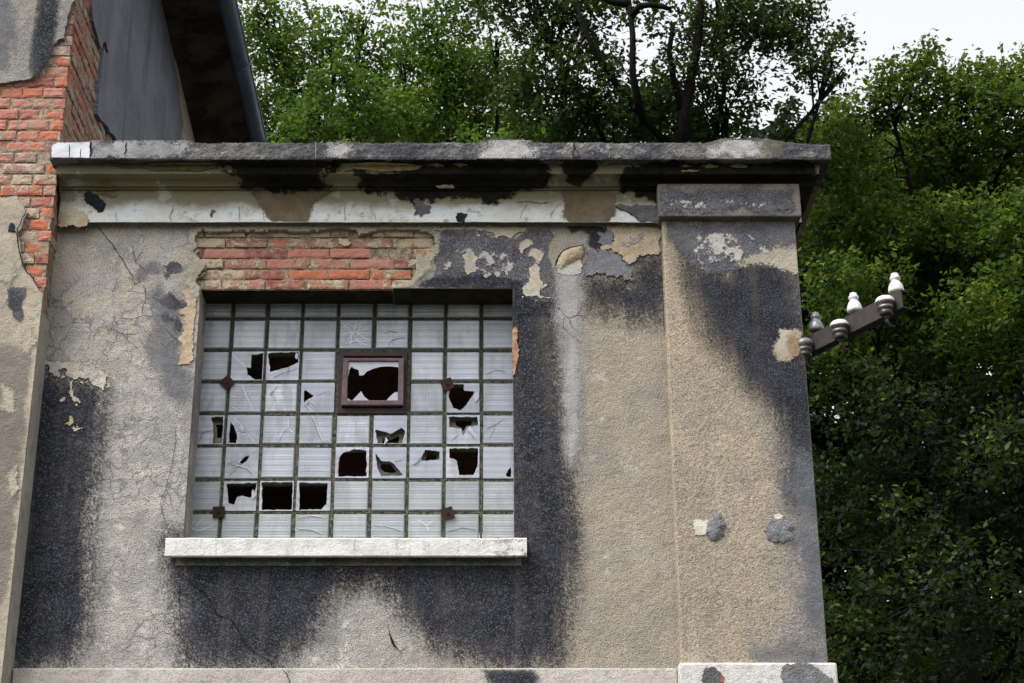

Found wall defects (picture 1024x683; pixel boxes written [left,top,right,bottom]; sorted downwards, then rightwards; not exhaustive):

spalling [0,0,117,311]
crack [98,211,178,348]
spalling [171,198,551,365]
peeling [583,203,661,285]
peeling [694,232,798,274]
spalling [512,327,520,375]
peeling [0,383,16,413]
peeling [45,359,111,436]
leakage [156,160,826,683]
peeling [5,465,20,502]
leakage [0,344,112,668]
peeling [693,519,708,536]